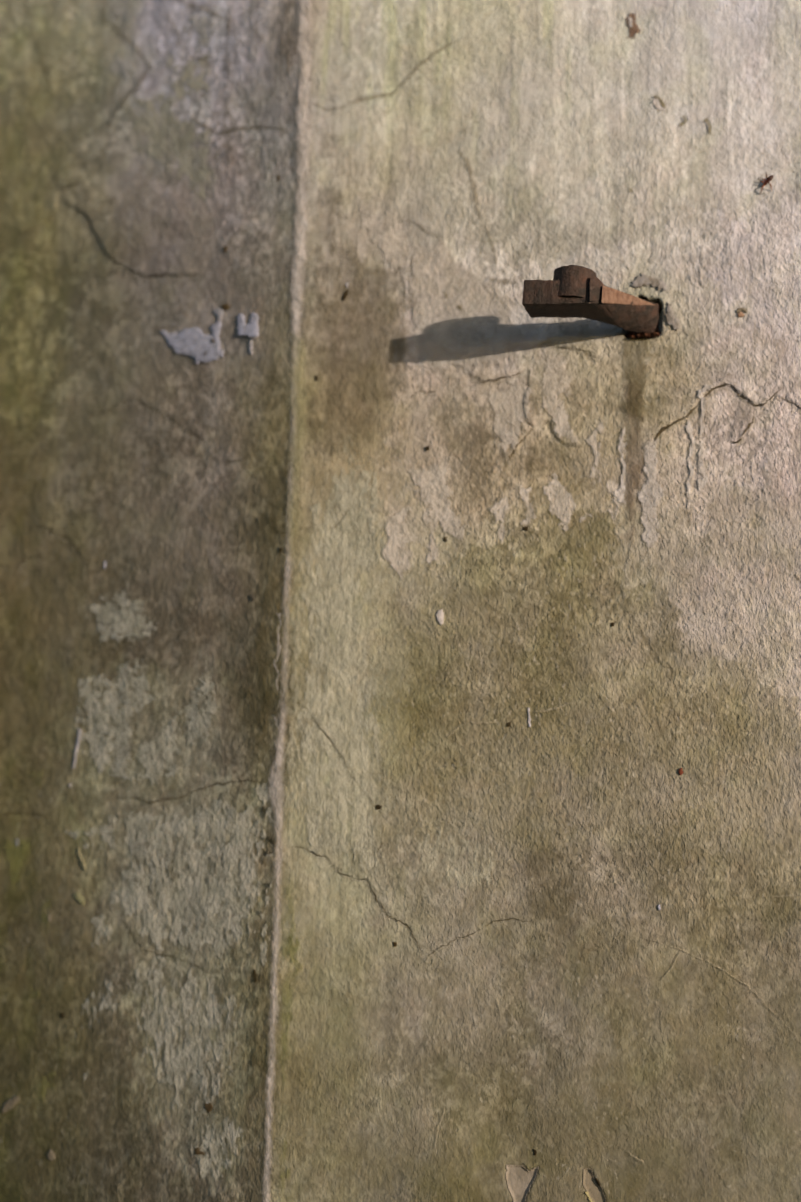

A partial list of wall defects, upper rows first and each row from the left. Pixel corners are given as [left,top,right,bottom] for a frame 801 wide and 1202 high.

crack [195,119,292,134]
crack [20,174,212,279]
peeling [490,473,592,541]
peeling [489,348,620,518]
water stain [614,428,664,548]
water stain [686,384,712,509]
crack [654,383,801,443]
crack [293,824,525,960]
spalling [505,1149,539,1202]
spalling [582,1168,606,1202]